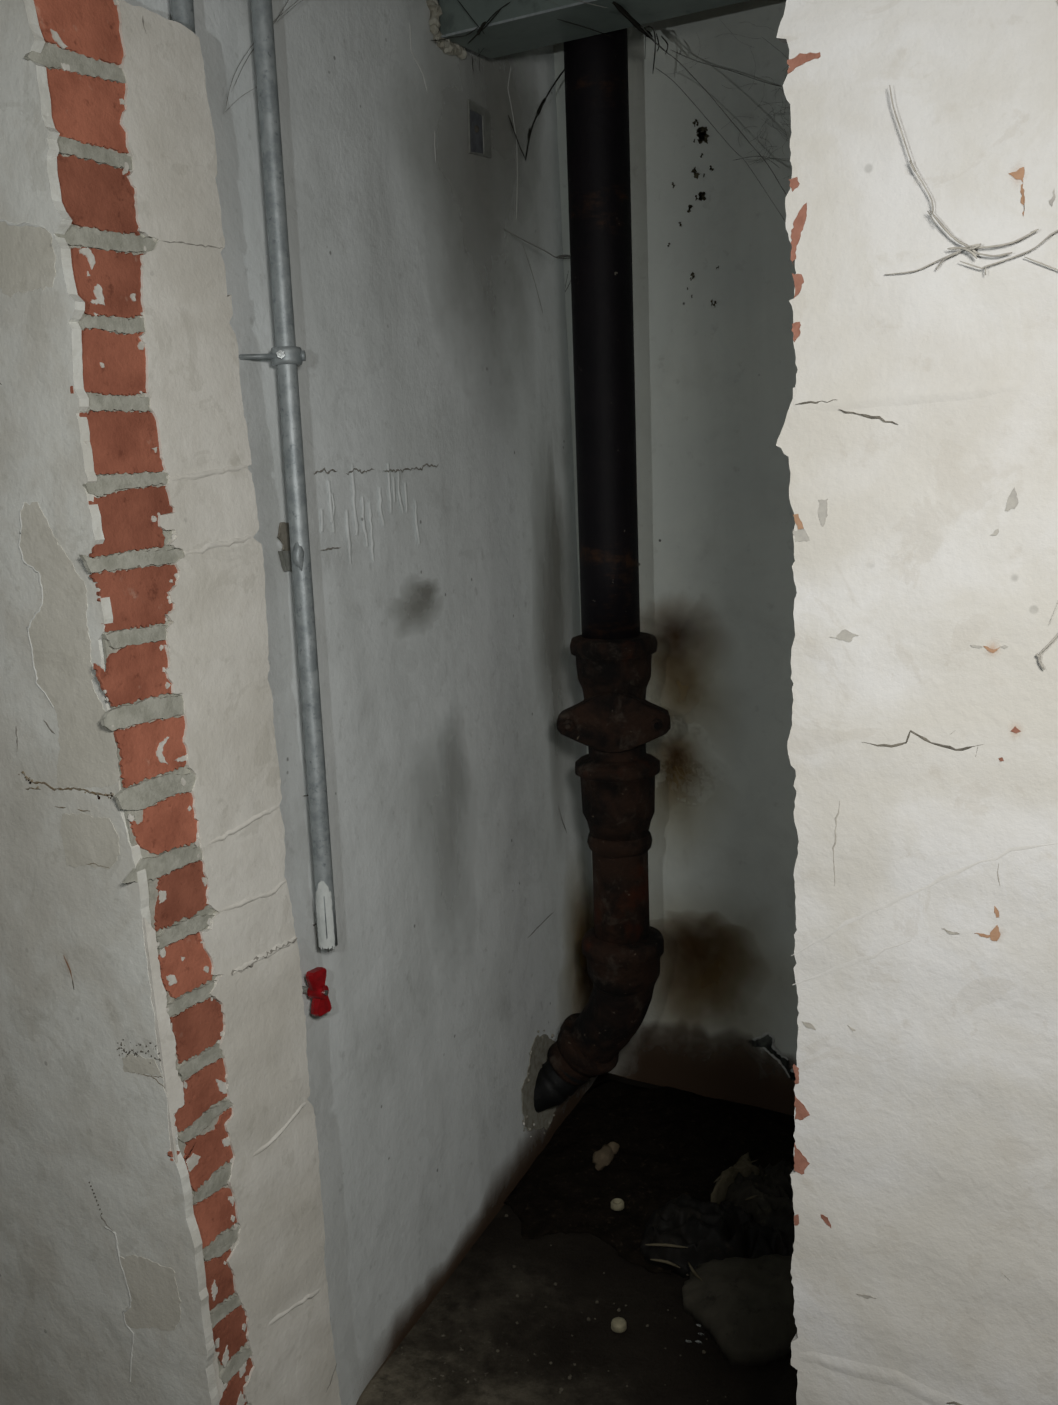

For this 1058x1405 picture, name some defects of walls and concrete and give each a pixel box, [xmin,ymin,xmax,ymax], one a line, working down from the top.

spalling [0,0,253,1405]
rust [655,616,702,715]
crack [864,730,984,757]
crack [18,771,114,812]
rust [573,913,594,1001]
damp [616,1026,797,1115]
peeling [748,1032,810,1120]